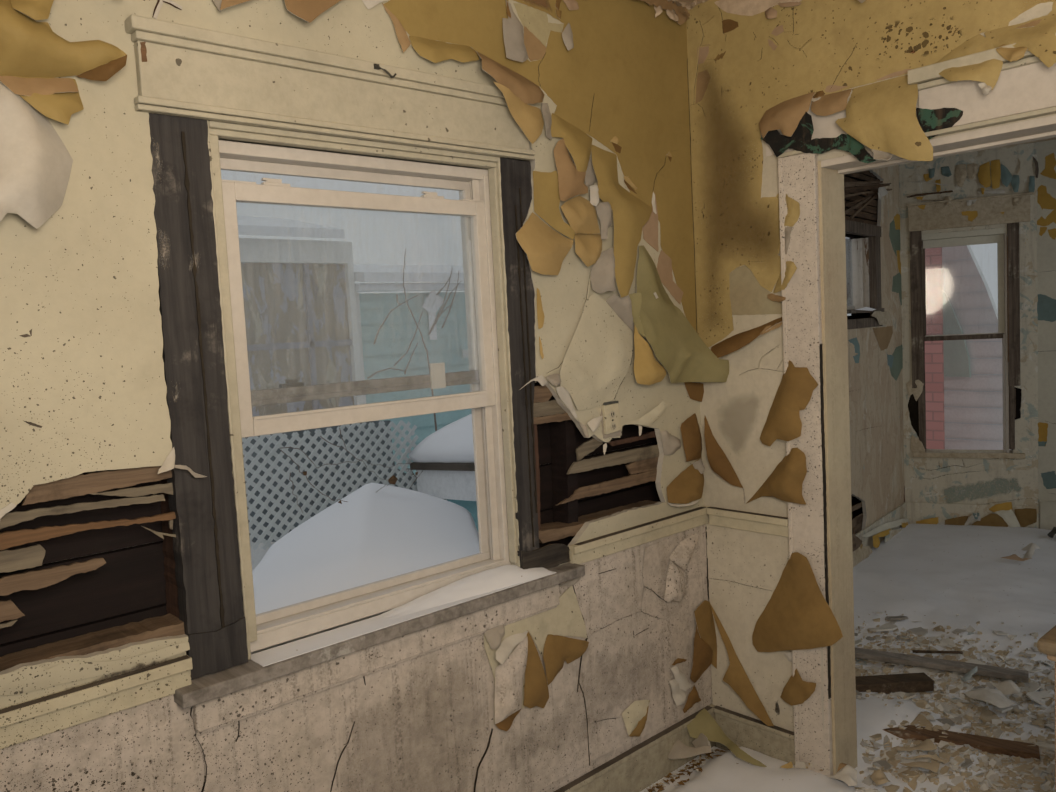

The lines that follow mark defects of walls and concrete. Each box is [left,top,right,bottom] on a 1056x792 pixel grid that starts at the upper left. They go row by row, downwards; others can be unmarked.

crack [152,0,182,19]
flaking render [502,0,579,62]
peeling [641,0,802,33]
peeling [911,153,1056,240]
flaking render [729,265,782,315]
peeling [1035,277,1056,322]
hole [521,373,681,543]
peeling [1038,422,1048,446]
hole [852,502,863,534]
hole [0,447,207,695]
crack [330,721,355,792]
crack [473,729,494,792]